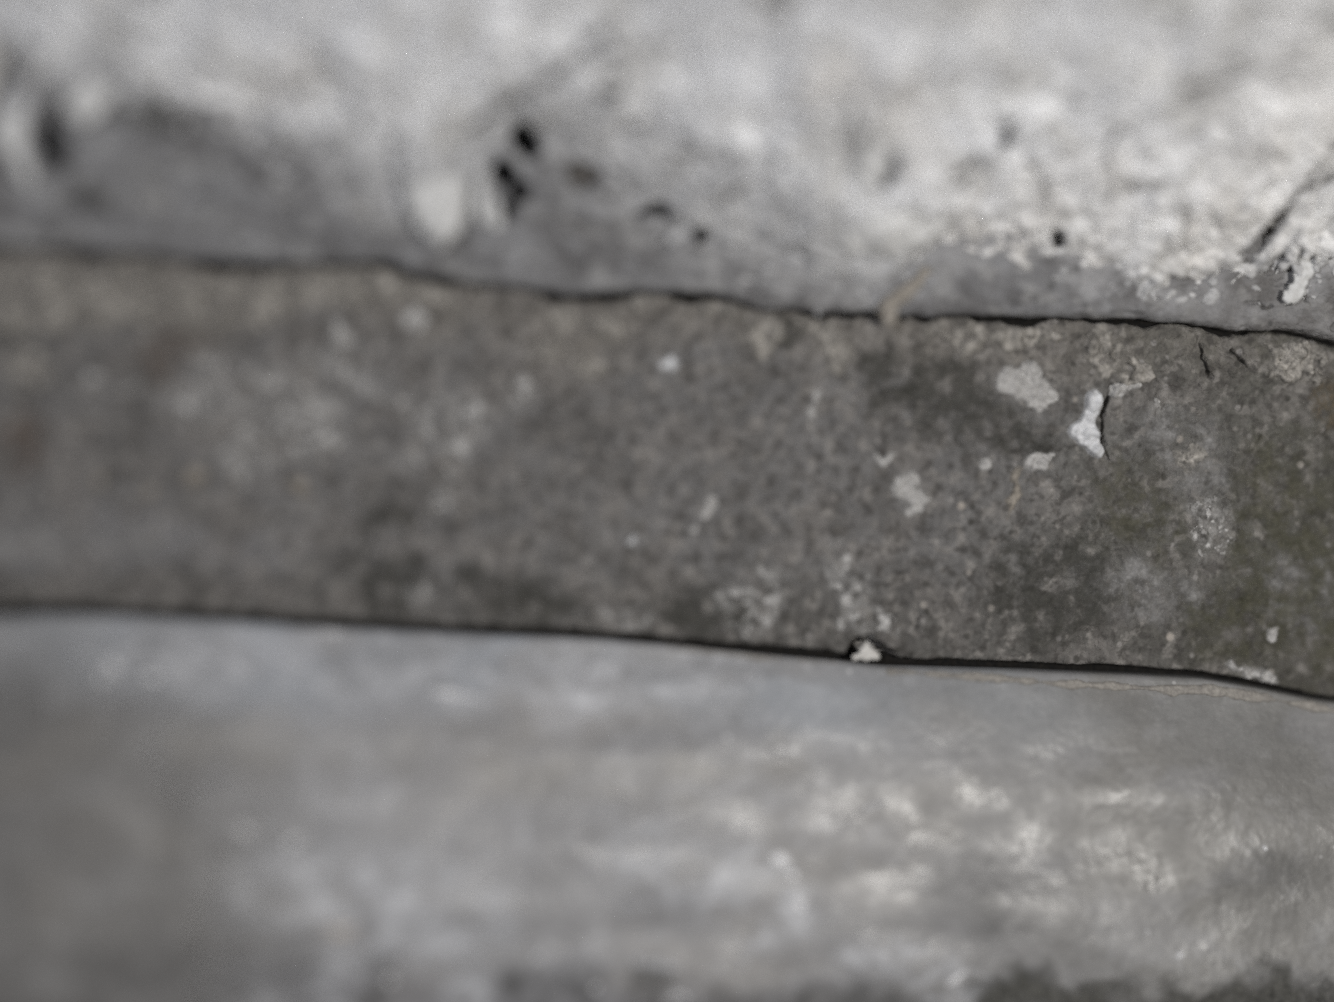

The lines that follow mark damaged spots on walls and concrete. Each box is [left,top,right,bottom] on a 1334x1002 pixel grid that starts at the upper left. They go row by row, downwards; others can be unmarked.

peeling [0,62,118,186]
peeling [396,121,539,247]
crack [0,245,1334,378]
peeling [876,266,933,327]
peeling [1279,233,1334,304]
crack [0,604,1334,700]